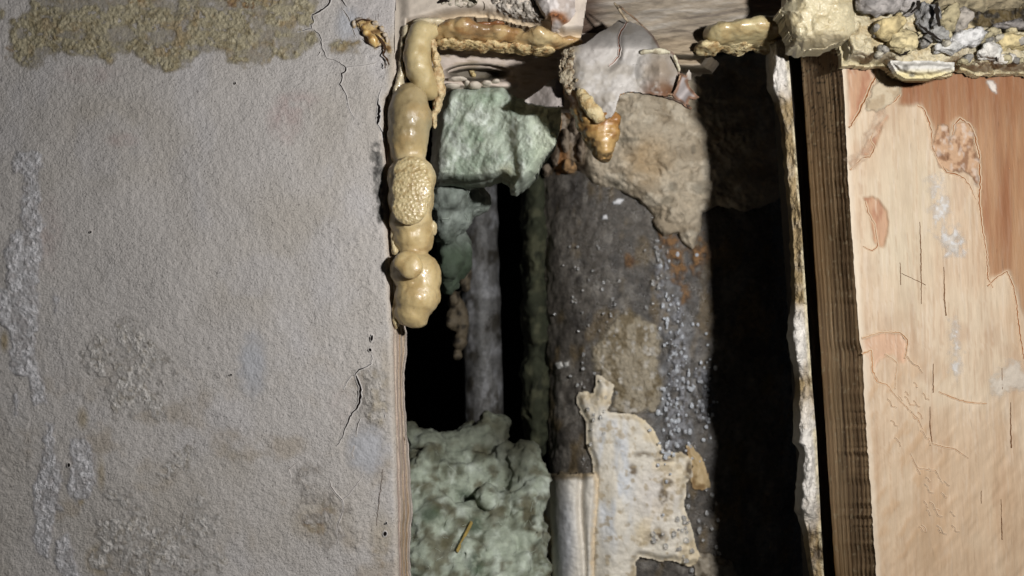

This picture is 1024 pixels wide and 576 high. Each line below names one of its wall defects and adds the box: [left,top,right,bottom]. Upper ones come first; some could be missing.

damp [0,0,316,72]
crack [297,0,385,141]
rust [660,234,709,305]
damp [592,250,712,452]
crack [336,354,386,446]